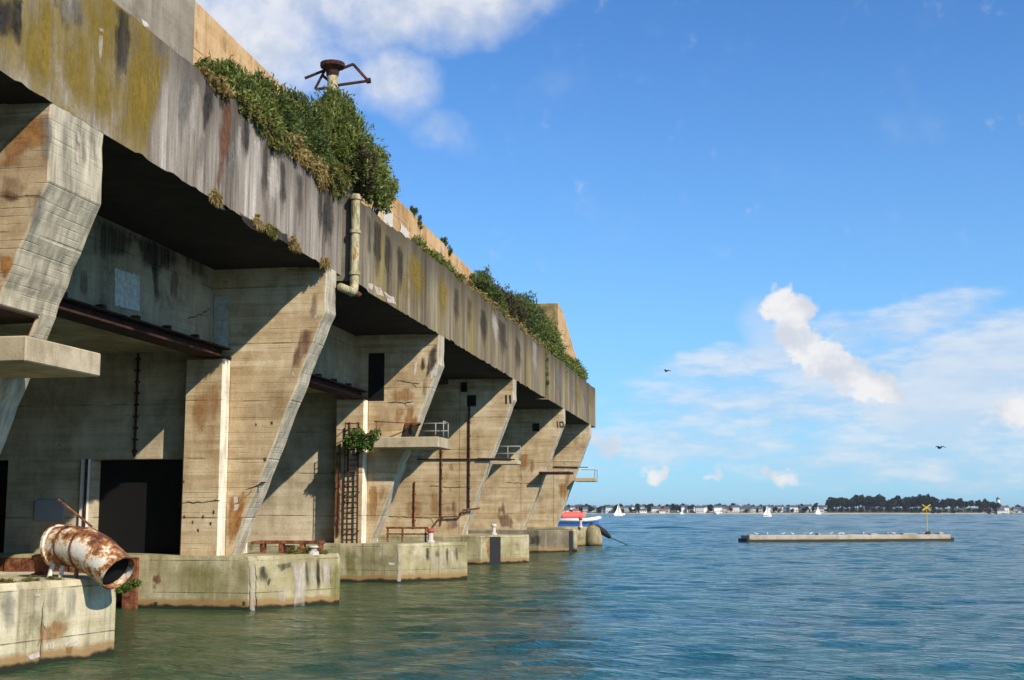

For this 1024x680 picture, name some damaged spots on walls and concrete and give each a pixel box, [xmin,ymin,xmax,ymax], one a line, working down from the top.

water stain [0,0,23,43]
water stain [116,9,130,69]
corrosion [6,119,43,164]
corrosion [220,102,231,160]
water stain [374,223,424,293]
water stain [481,311,506,347]
water stain [422,346,436,374]
corrosion [229,494,244,540]